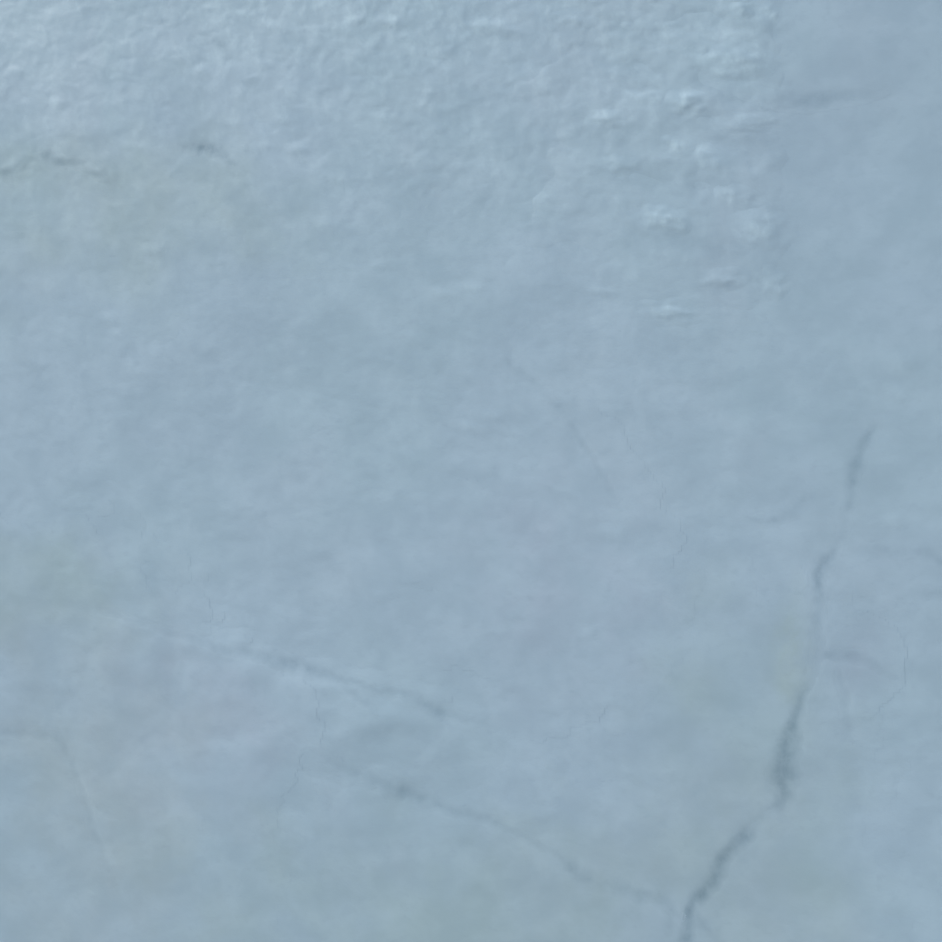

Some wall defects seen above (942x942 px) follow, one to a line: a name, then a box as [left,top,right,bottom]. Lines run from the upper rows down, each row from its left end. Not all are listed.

crack [676,415,906,942]